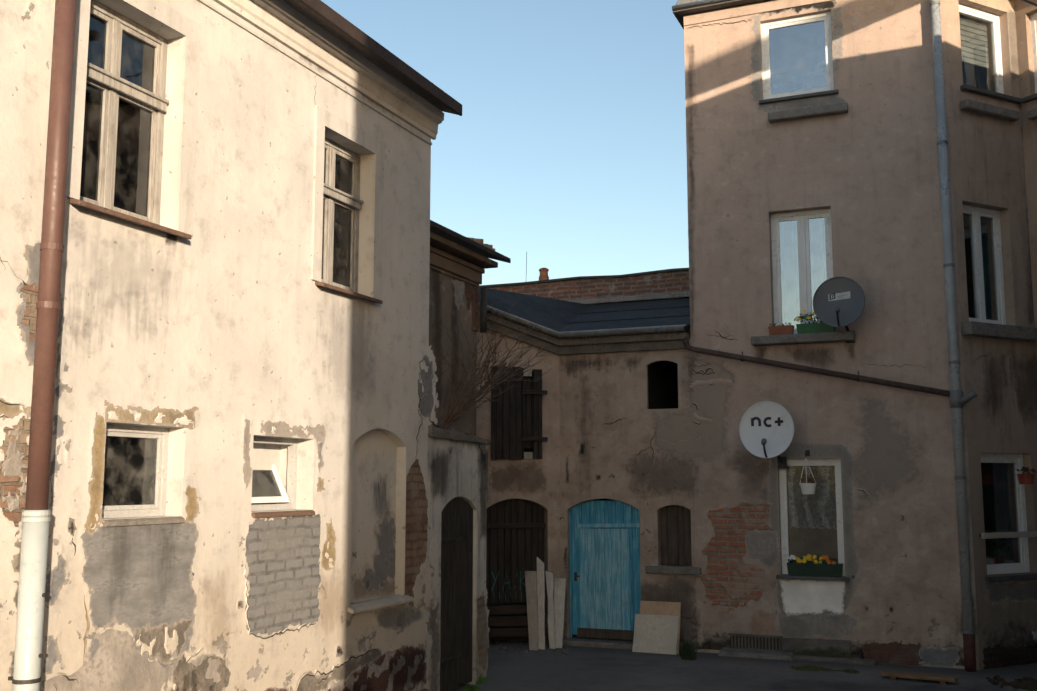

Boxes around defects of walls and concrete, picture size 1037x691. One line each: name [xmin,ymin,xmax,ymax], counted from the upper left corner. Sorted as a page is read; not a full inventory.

peeling [13,0,55,31]
spalling [0,216,42,691]
peeling [48,240,79,511]
flaking render [79,392,202,537]
flaking render [239,410,331,499]
spalling [411,343,439,432]
peeling [40,533,77,685]
peeling [130,448,441,691]
flaking render [693,493,780,621]